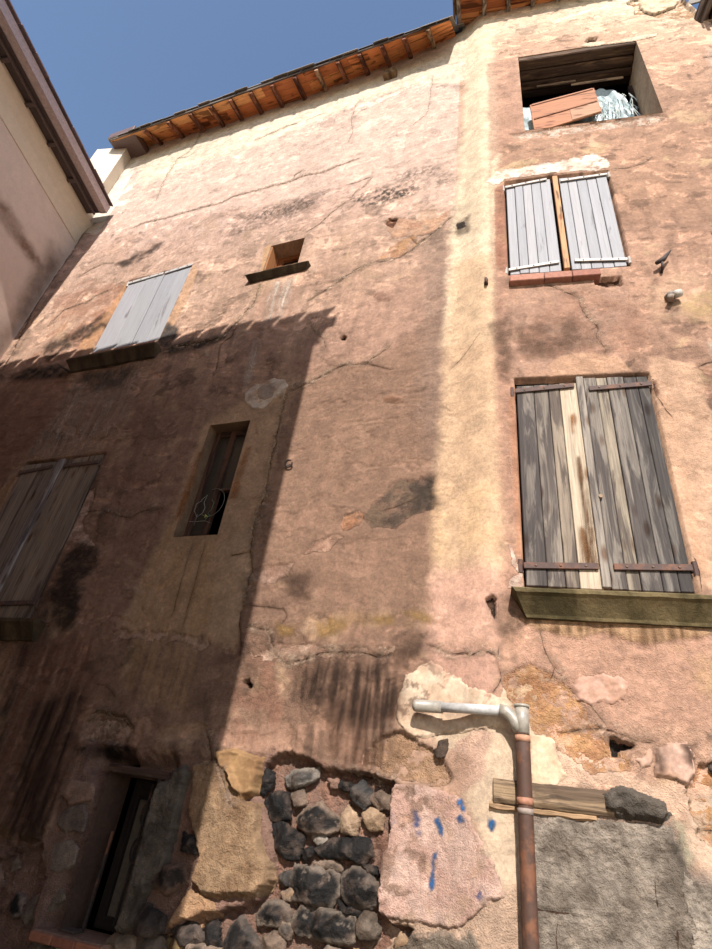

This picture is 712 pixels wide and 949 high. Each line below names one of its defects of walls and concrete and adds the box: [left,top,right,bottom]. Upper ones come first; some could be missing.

peeling [627,0,700,23]
crack [135,162,369,232]
water stain [17,235,38,259]
water stain [10,316,107,379]
crack [160,284,262,372]
crack [545,283,606,351]
water stain [53,546,95,631]
water stain [10,696,71,836]
water stain [330,659,396,765]
spalling [502,664,712,846]
flaking render [0,780,95,949]
flaking render [105,732,480,949]